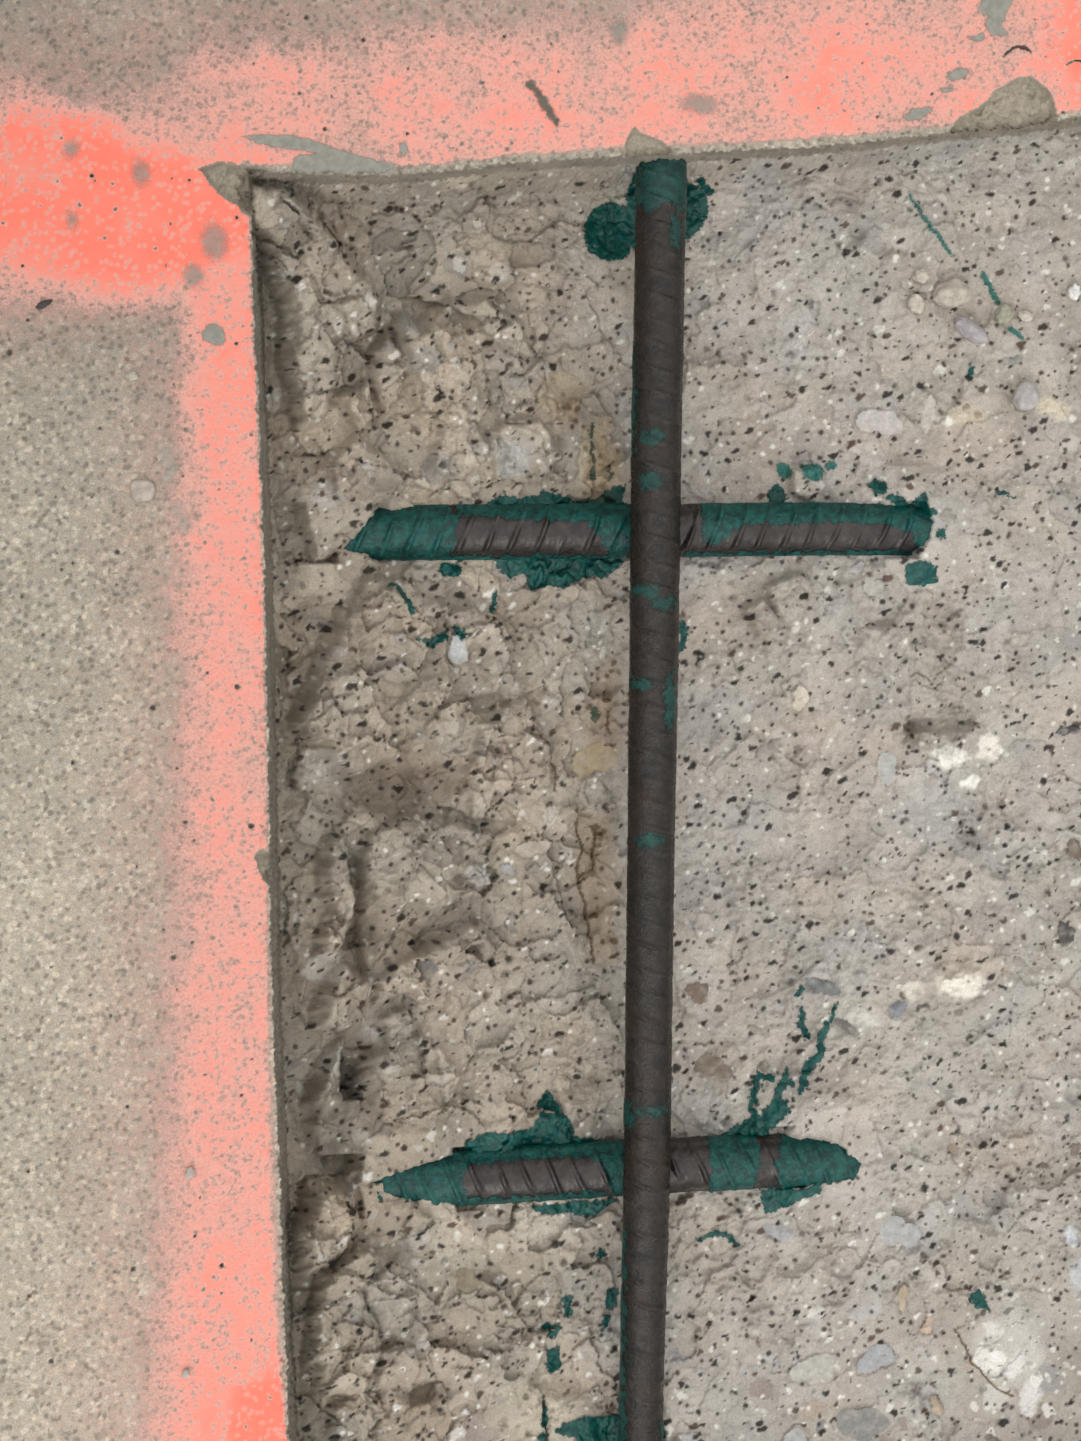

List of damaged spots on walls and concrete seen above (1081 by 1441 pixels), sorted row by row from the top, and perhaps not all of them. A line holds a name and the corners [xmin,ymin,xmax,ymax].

spalling [199,67,1081,1441]